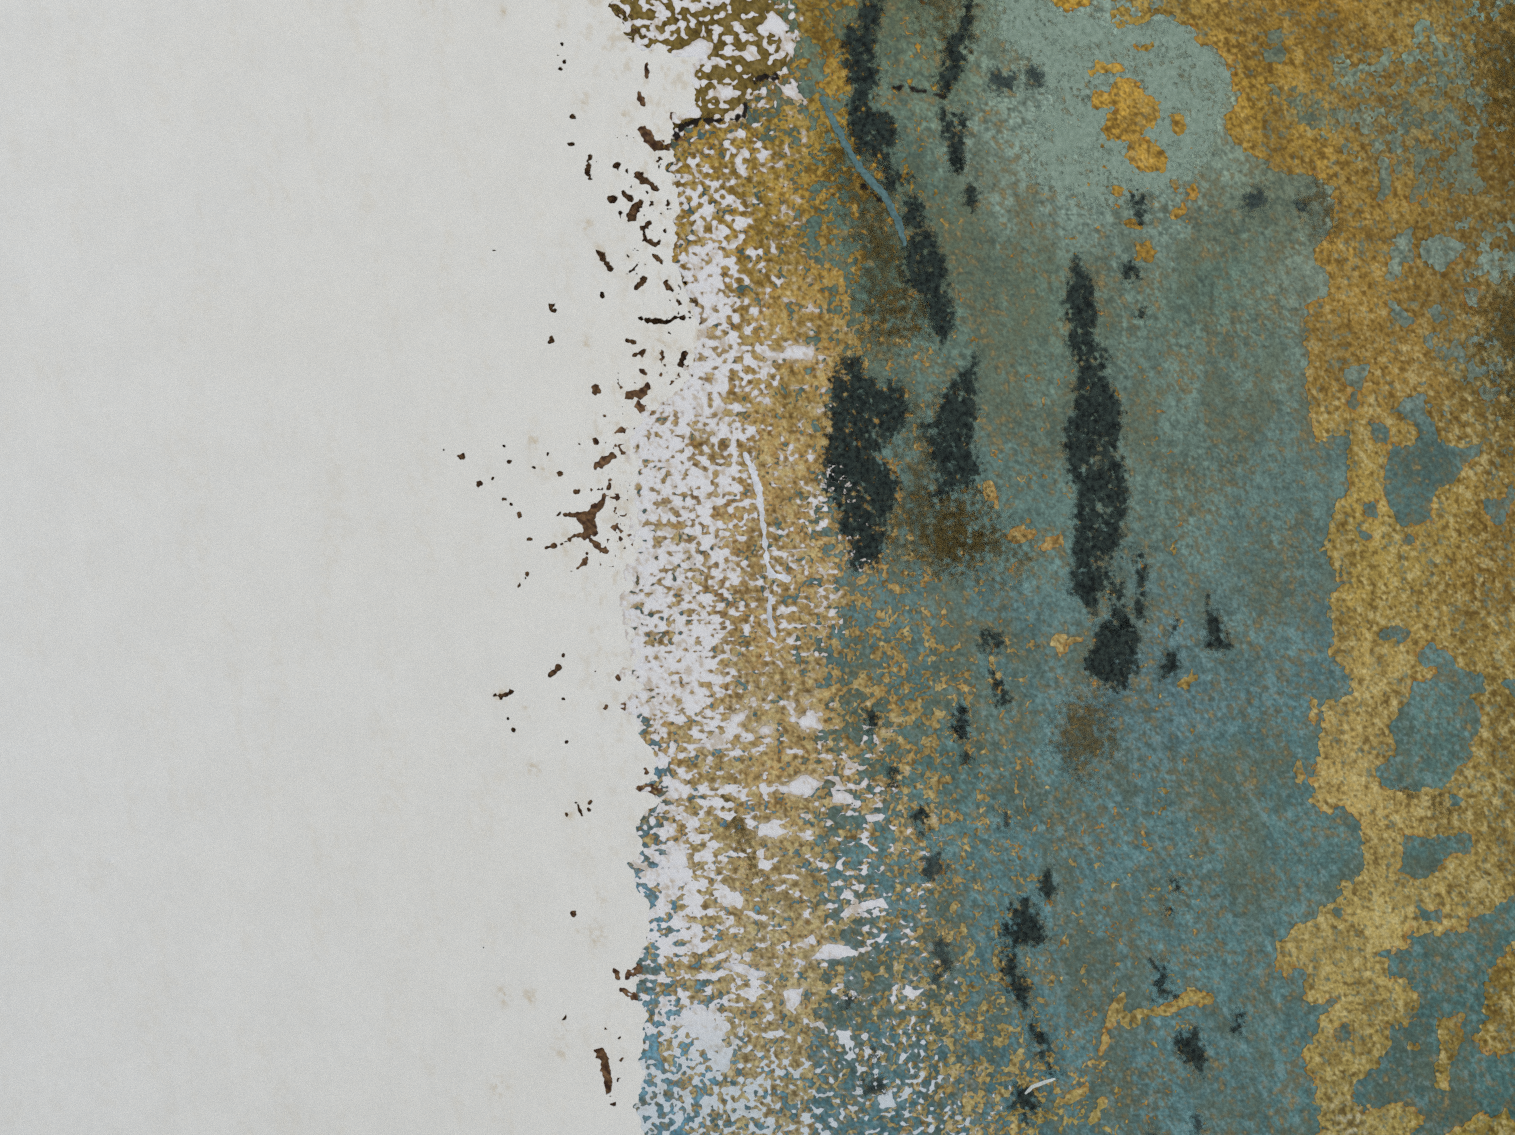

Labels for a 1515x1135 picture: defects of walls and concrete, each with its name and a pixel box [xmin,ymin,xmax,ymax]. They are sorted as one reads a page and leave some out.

peeling [527,0,1214,1135]
peeling [1110,0,1515,1135]